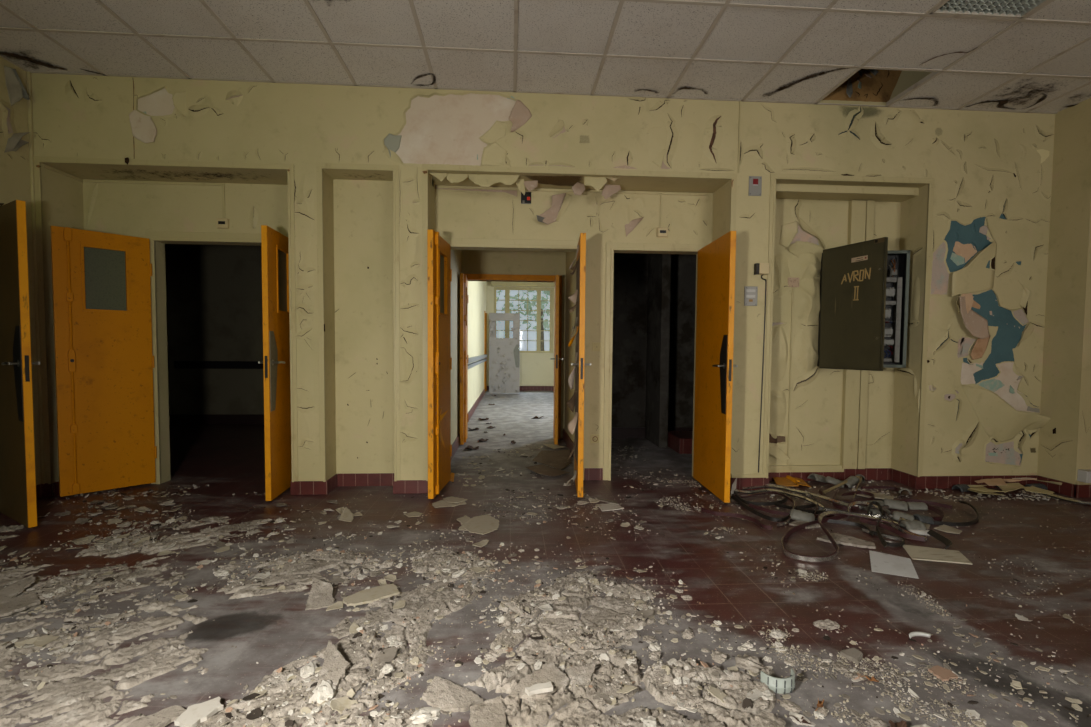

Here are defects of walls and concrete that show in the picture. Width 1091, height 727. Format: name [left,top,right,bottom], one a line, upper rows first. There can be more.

peeling [128,86,186,143]
peeling [383,91,532,188]
peeling [536,193,572,225]
crack [614,70,1050,280]
peeling [846,69,878,98]
leakage [966,79,1055,110]
crack [399,178,420,443]
peeling [930,215,1040,414]